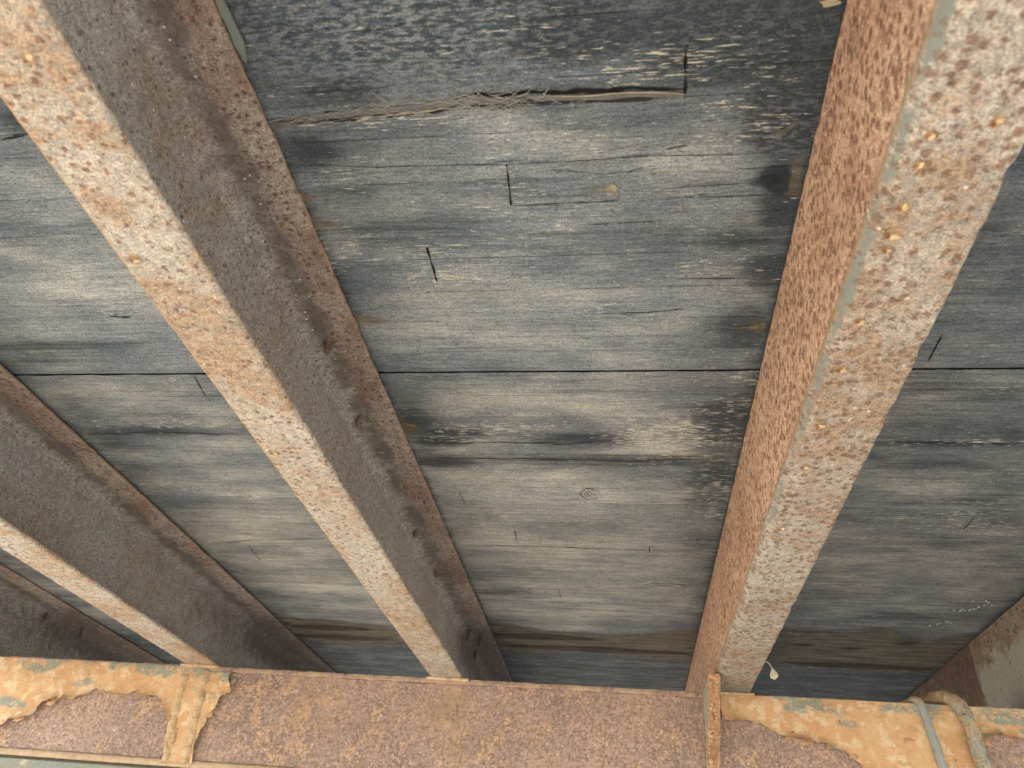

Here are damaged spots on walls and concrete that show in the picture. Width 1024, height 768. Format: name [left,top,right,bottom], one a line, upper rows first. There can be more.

crack [267,85,686,128]
rust [990,115,1006,128]
crack [345,162,451,170]
crack [481,145,785,198]
damp [755,167,789,193]
damp [277,618,402,645]
damp [488,622,699,660]
damp [766,629,976,673]
peeling [0,657,236,764]
peeling [721,695,976,768]
peeling [969,706,1024,747]